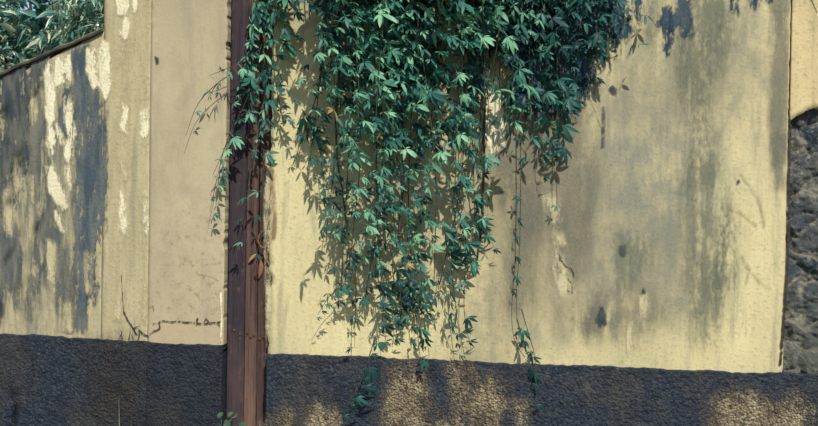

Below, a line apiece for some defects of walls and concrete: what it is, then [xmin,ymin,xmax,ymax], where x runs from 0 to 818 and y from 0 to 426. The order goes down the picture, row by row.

peeling [3,157,34,236]
peeling [30,54,76,233]
leakage [0,44,108,334]
peeling [85,0,138,100]
peeling [118,191,128,235]
peeling [120,103,129,135]
peeling [139,109,150,139]
peeling [478,60,507,154]
flaking render [543,192,570,297]
leakage [493,0,740,338]
leakage [768,0,789,185]
crack [121,276,221,337]